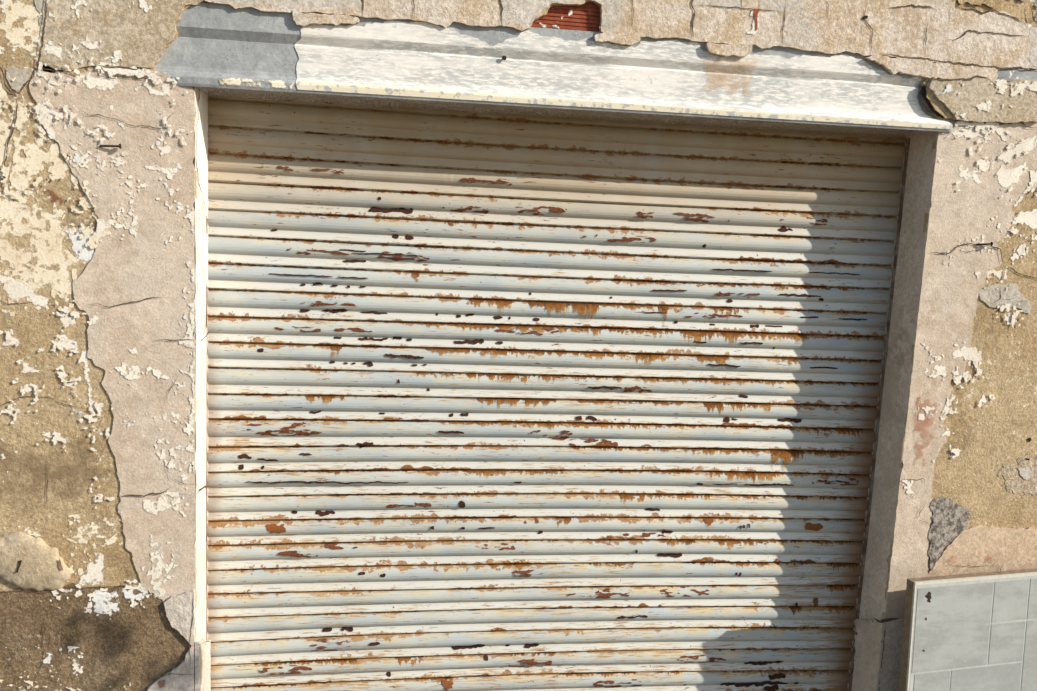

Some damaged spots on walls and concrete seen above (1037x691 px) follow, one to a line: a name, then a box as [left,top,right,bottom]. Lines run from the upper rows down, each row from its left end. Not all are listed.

spalling [531,2,641,46]
crack [864,2,1037,70]
crack [0,0,148,183]
crack [81,109,172,134]
corrosion [442,205,565,226]
spalling [865,55,1037,336]
crack [91,297,159,308]
peeling [0,0,212,691]
corrosion [222,229,877,629]
corrosion [233,613,358,689]
corrosion [561,672,642,688]
corrosion [657,647,825,691]